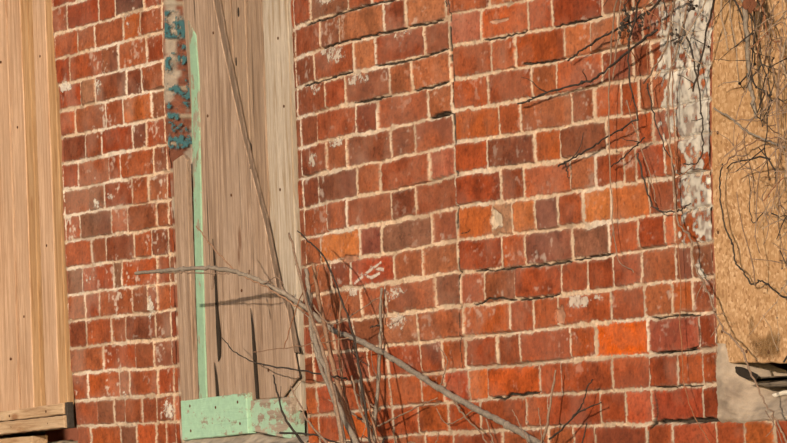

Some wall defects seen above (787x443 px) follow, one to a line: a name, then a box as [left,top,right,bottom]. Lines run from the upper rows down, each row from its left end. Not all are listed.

crack [447,0,455,89]
peeling [655,0,713,244]
crack [459,294,560,354]